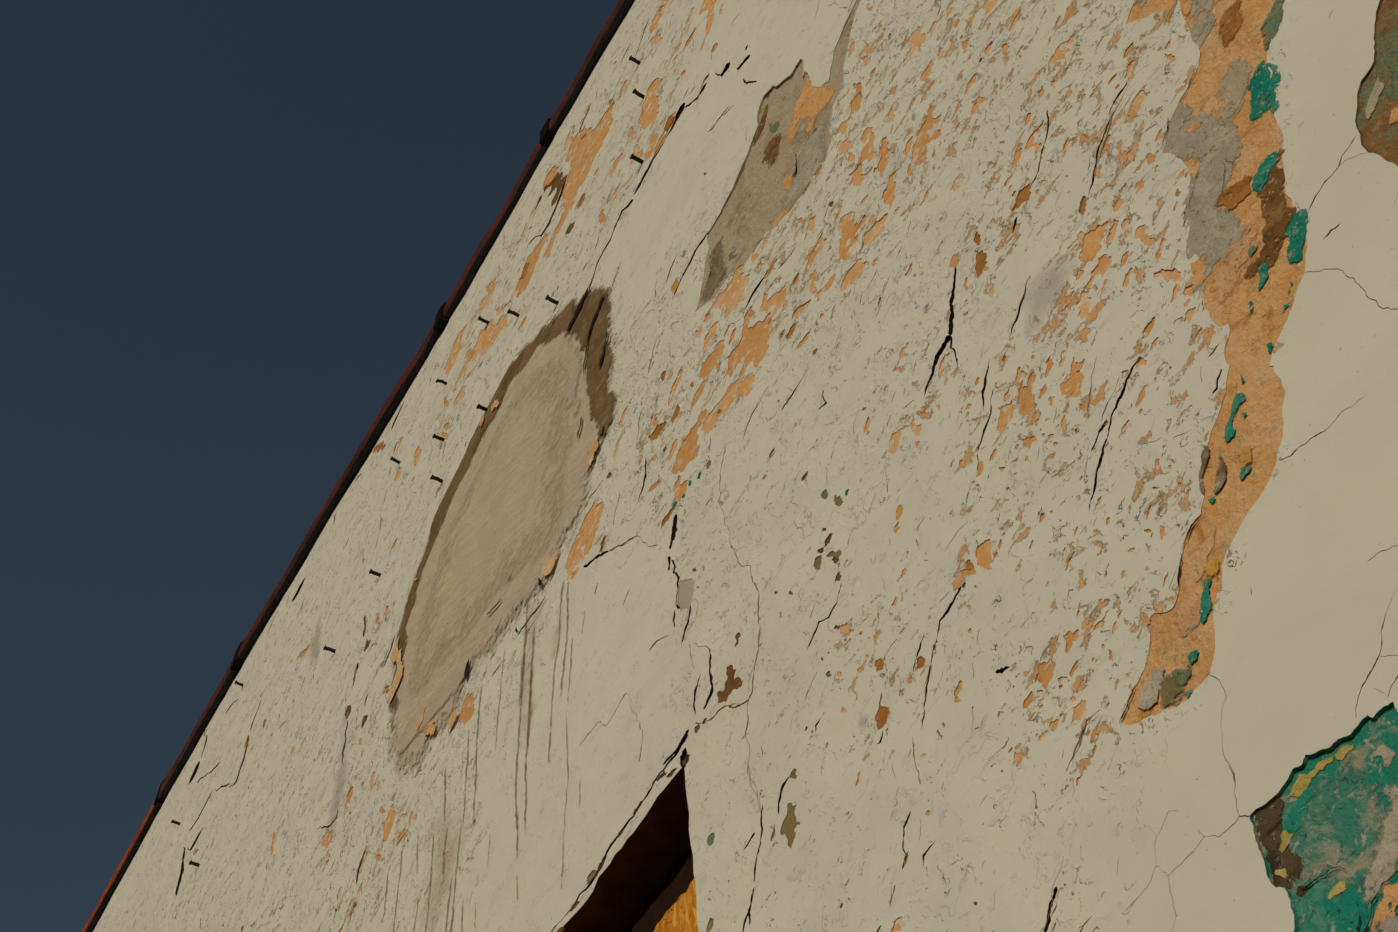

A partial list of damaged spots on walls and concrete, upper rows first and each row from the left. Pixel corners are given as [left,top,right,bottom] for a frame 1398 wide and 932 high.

spalling [1355,0,1398,166]
peeling [440,78,677,443]
peeling [648,0,1023,528]
crack [551,83,1165,932]
peeling [959,350,1085,488]
crack [1156,499,1201,614]
crack [1143,305,1222,444]
peeling [1064,0,1308,725]
crack [1271,138,1398,310]
crack [1355,597,1398,715]
crack [1044,675,1249,932]
spalling [1250,702,1398,932]